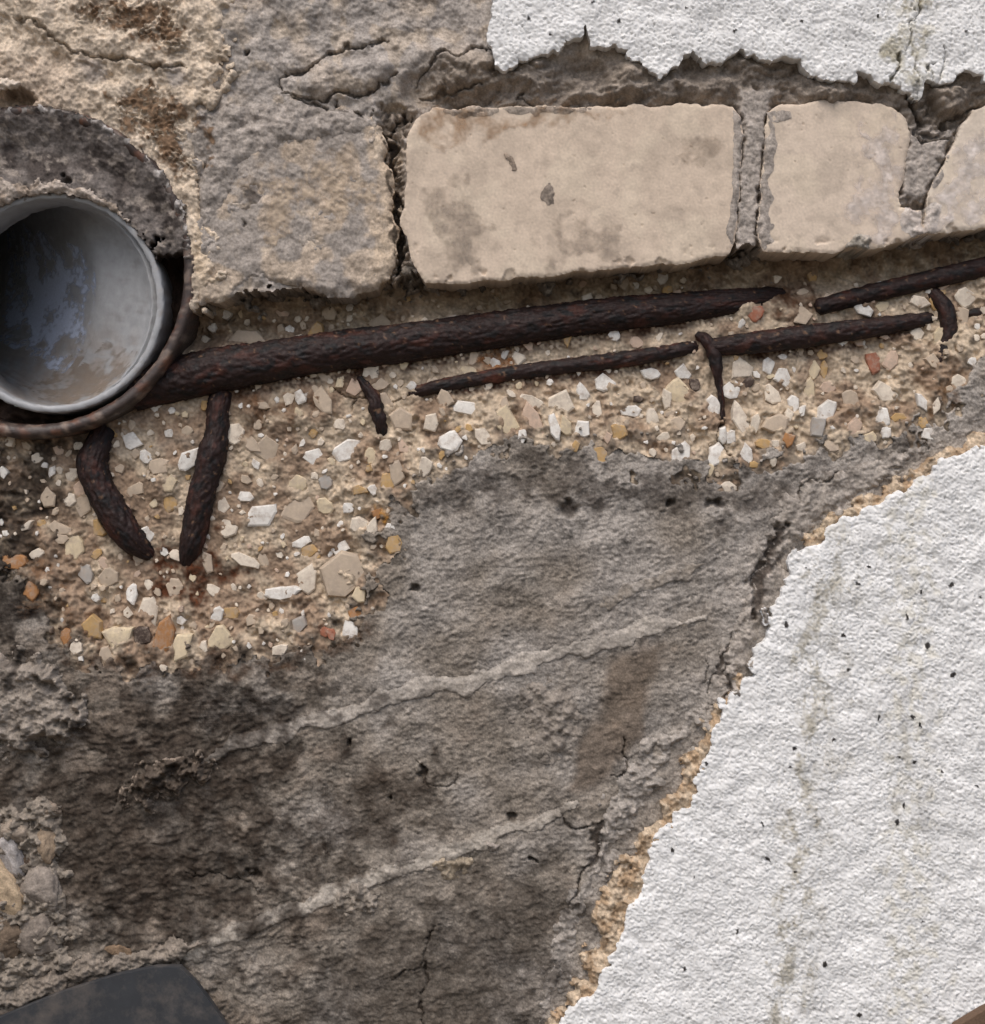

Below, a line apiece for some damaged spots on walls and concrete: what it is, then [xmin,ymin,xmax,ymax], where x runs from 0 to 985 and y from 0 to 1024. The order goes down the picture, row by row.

crack [383,119,406,275]
corrosion [234,366,387,429]
corrosion [407,341,563,370]
spalling [0,0,985,682]
corrosion [451,369,622,394]
corrosion [627,322,686,336]
leakage [0,437,84,684]
corrosion [151,545,250,606]
leakage [0,637,330,948]
crack [564,819,604,896]